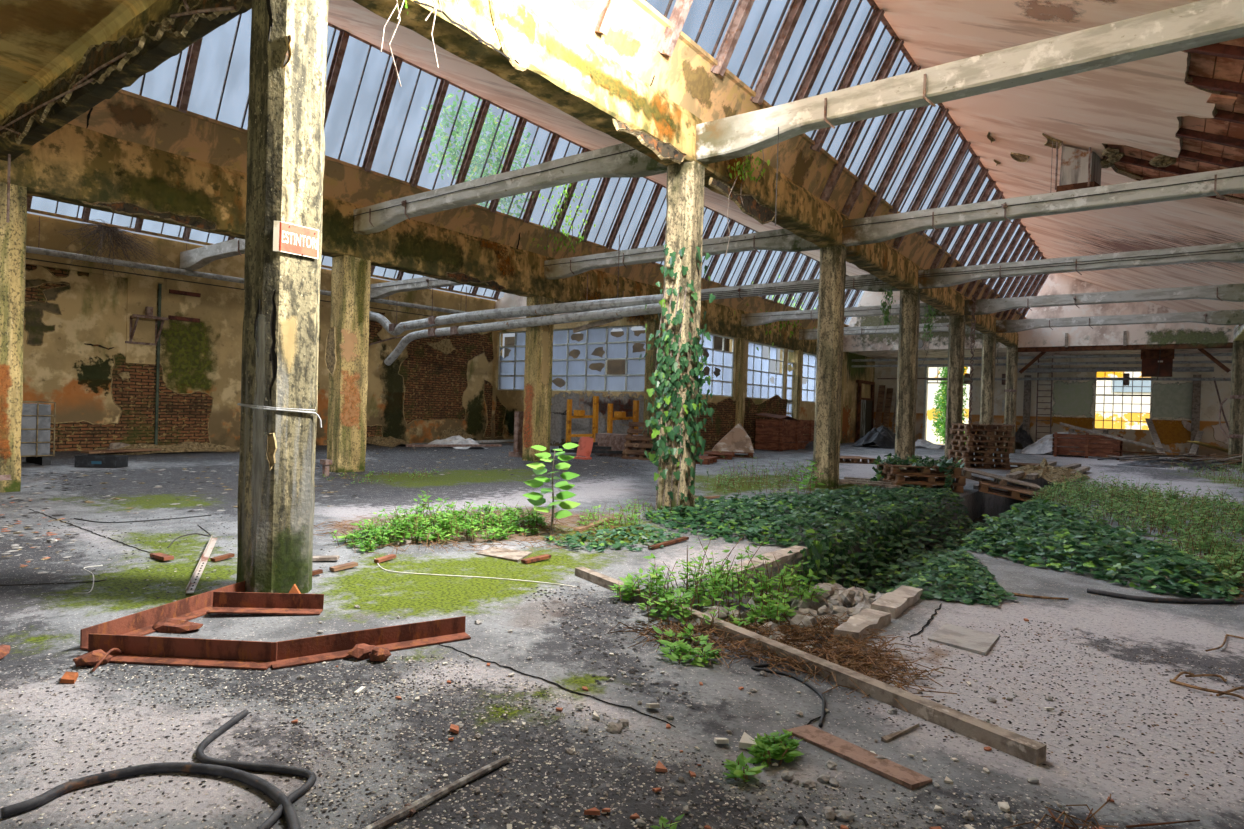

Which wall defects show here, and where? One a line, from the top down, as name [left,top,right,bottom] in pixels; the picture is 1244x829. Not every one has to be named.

spalling [0,0,244,145]
leakage [604,26,641,56]
leakage [683,60,736,117]
leakage [1026,0,1078,22]
flaking render [24,264,90,346]
peeling [0,364,12,459]
flaking render [50,350,214,452]
leakage [251,314,266,543]
flaking render [398,331,494,425]
flaking render [483,380,507,438]
peeling [523,325,644,448]